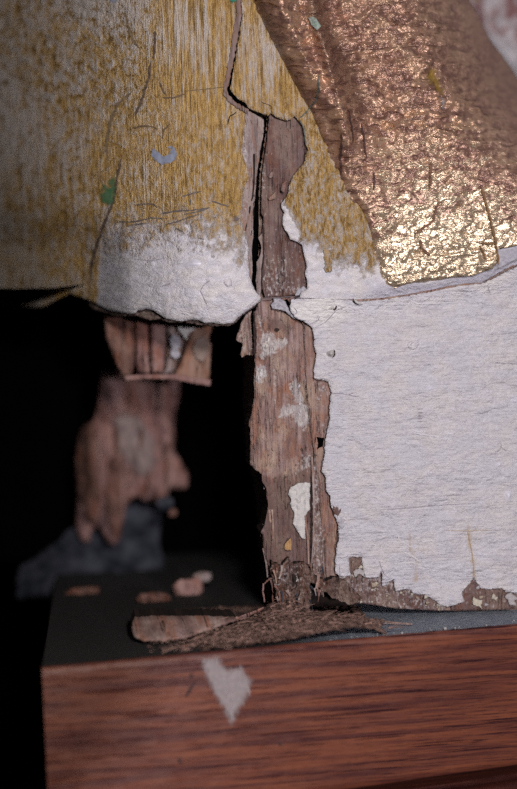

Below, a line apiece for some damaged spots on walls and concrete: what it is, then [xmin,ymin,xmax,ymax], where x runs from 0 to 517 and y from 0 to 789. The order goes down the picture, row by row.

crack [90,0,272,282]
crack [299,75,320,144]
spalling [0,111,517,613]